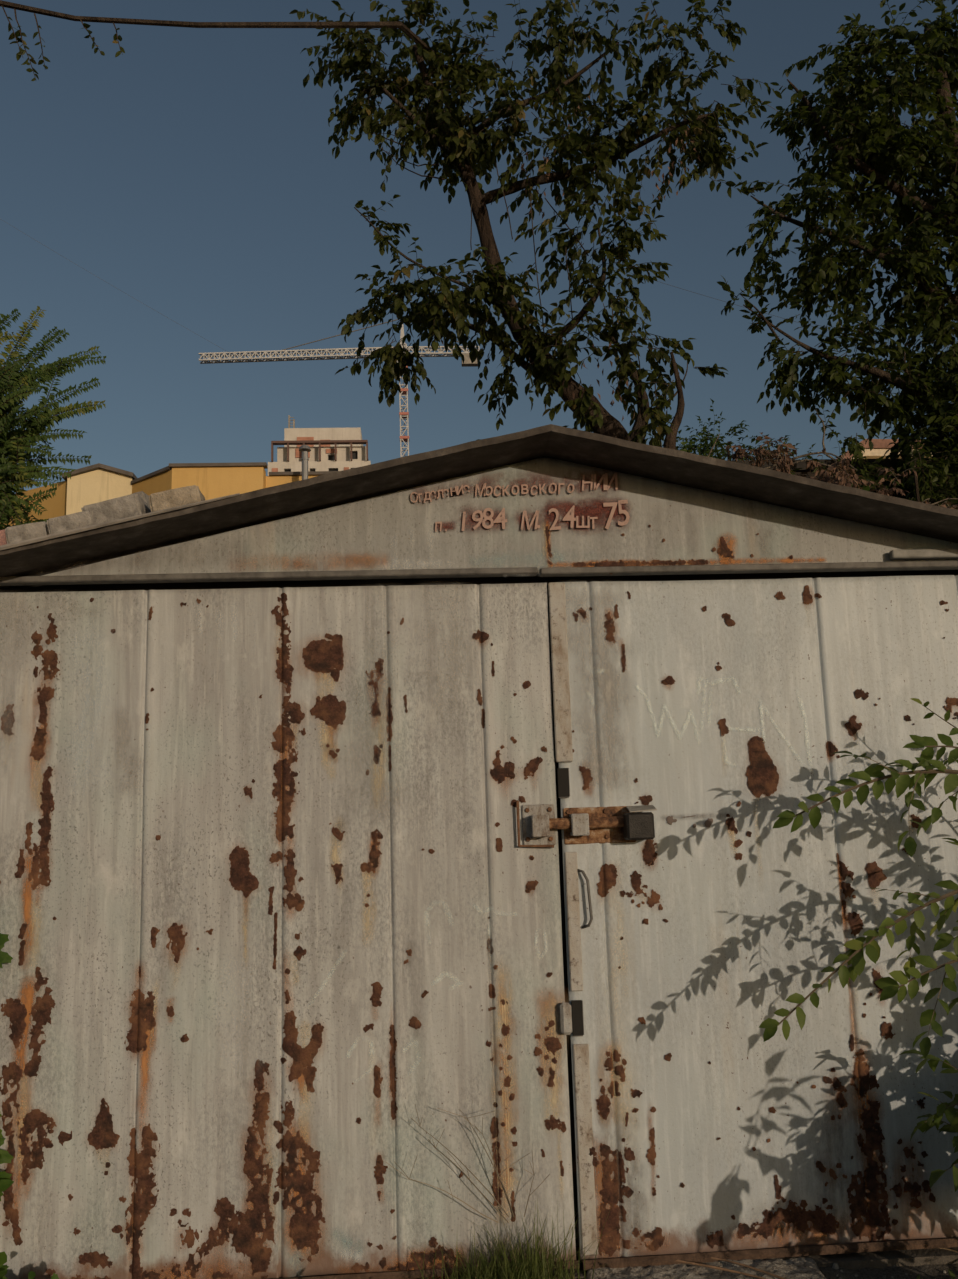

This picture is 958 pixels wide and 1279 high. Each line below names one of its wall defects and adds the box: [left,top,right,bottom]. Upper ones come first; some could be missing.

rust [229,593,347,974]
rust [490,737,547,784]
rust [746,736,779,798]
rust [0,613,72,1246]
rust [597,840,668,925]
rust [837,853,887,938]
rust [124,966,156,1104]
rust [87,990,326,1279]
rust [374,1025,398,1120]
rust [534,1001,567,1133]
rust [577,1049,665,1257]
rust [706,968,936,1249]